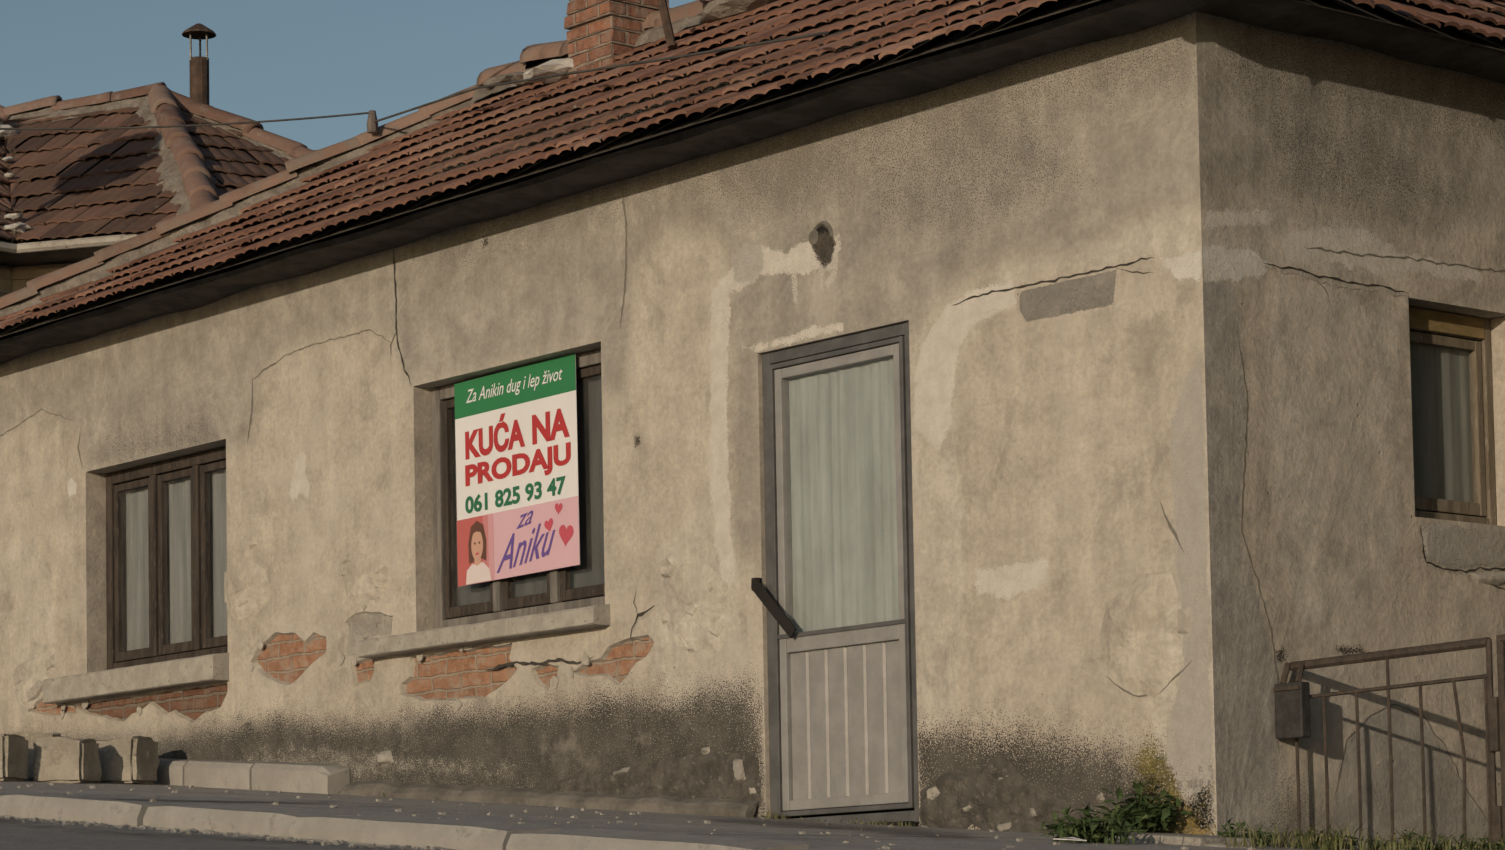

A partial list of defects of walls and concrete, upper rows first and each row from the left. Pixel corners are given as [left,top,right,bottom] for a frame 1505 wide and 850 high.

spalling [808,221,835,268]
crack [955,257,1155,305]
crack [1263,247,1505,298]
crack [247,257,411,442]
flaking render [13,652,228,722]
flaking render [250,604,393,685]
flaking render [400,635,654,711]
damp [7,659,1216,837]